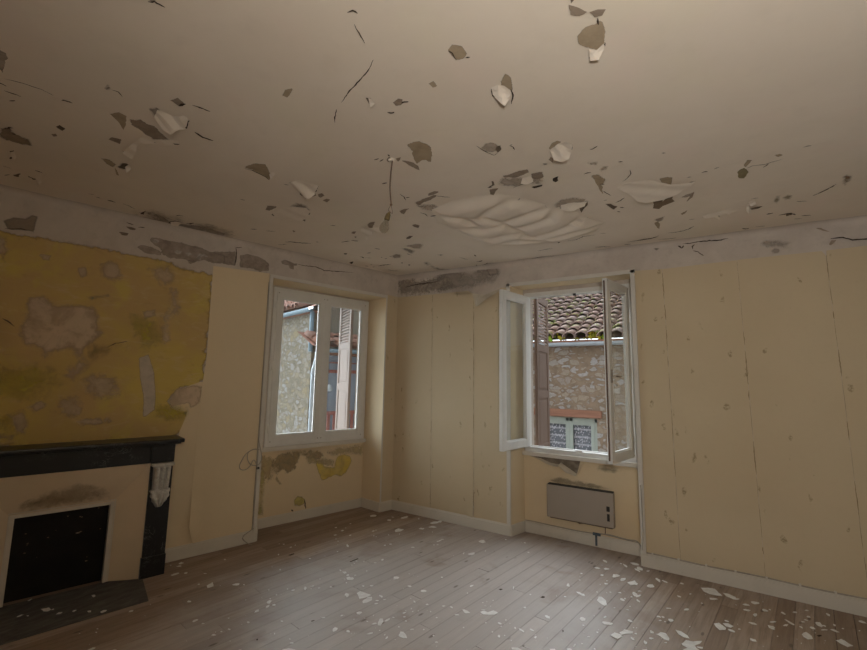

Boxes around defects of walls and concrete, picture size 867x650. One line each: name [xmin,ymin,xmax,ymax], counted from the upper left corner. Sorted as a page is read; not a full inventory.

peeling [569,0,606,61]
crack [334,10,373,121]
peeling [557,199,588,212]
damp [0,216,213,446]
peeling [139,355,155,416]